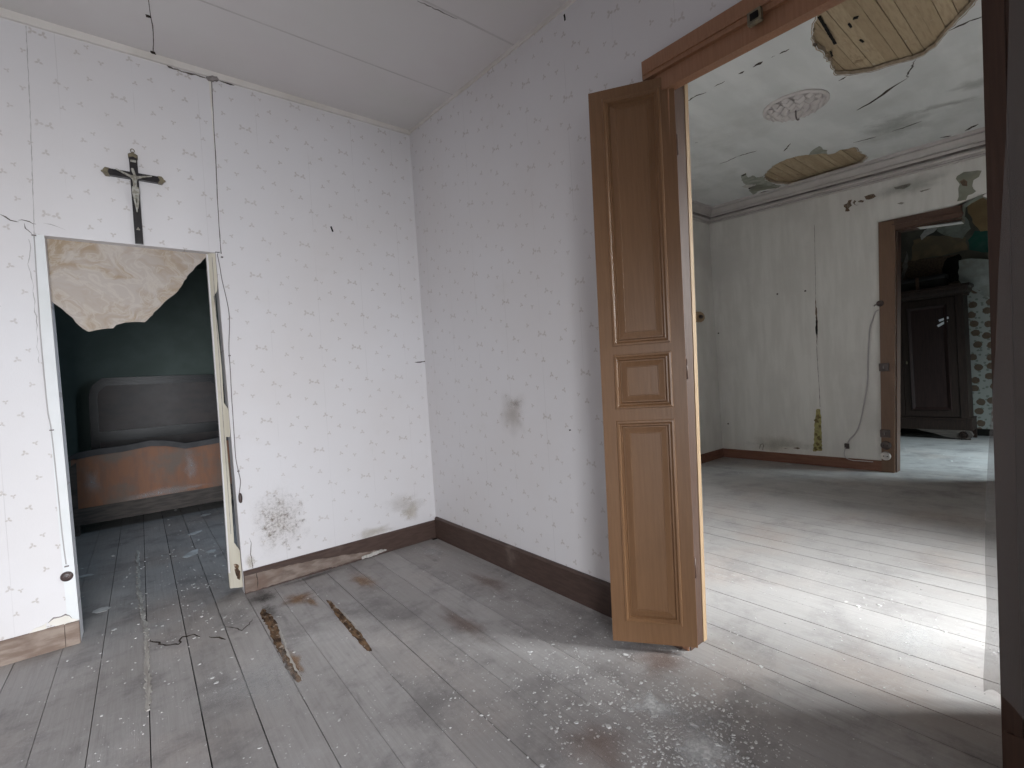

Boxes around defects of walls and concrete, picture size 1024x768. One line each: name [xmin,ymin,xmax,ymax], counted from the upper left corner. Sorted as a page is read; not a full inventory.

spalling [811,0,977,76]
crack [858,62,914,110]
flaking render [741,147,868,195]
peeling [844,194,876,212]
flaking render [956,170,988,231]
crack [0,214,63,362]